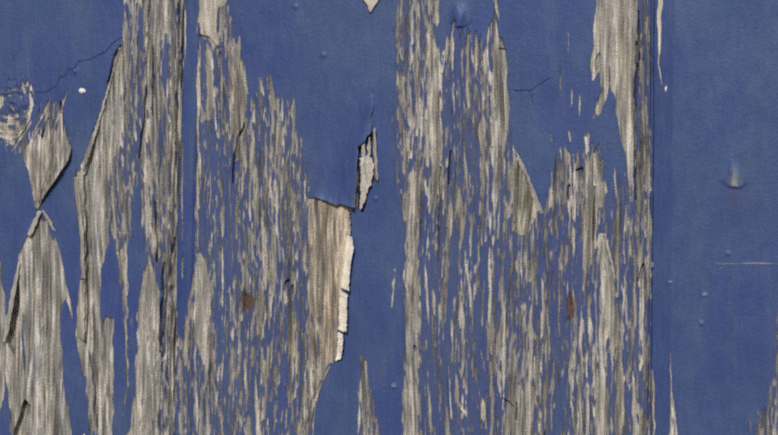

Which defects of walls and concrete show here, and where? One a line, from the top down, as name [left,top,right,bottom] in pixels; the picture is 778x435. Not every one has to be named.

crack [32,35,123,97]
peeling [0,0,380,435]
peeling [390,0,667,435]
peeling [669,350,678,435]
peeling [751,314,778,435]